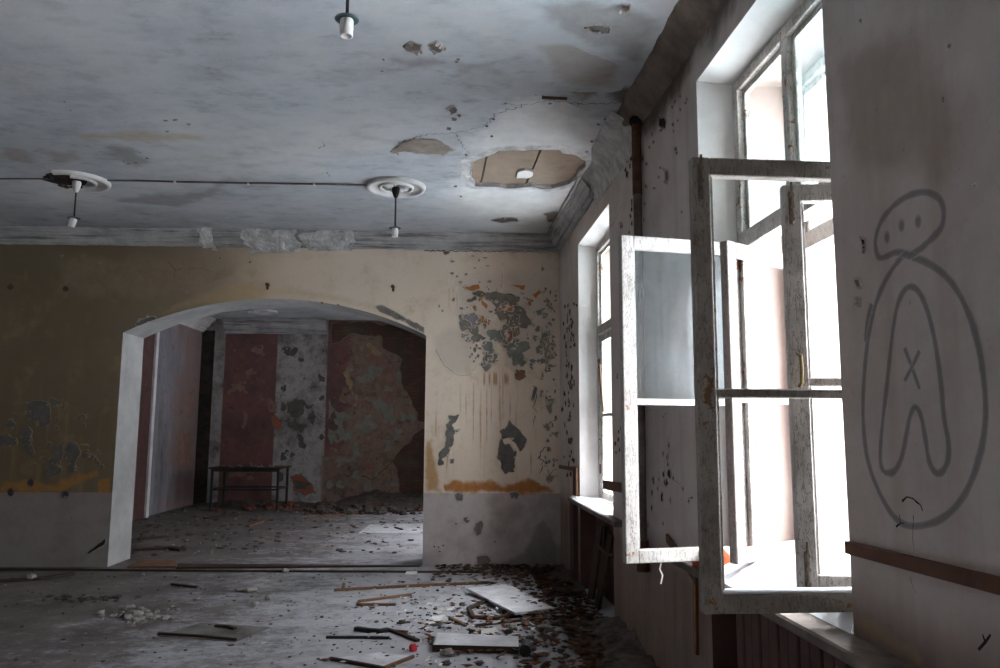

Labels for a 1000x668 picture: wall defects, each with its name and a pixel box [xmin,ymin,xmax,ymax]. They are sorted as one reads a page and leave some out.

peeling [403,40,446,56]
spalling [390,118,593,198]
crack [389,94,619,156]
flaking render [227,305,426,497]
peeling [438,414,460,465]
peeling [442,251,578,483]